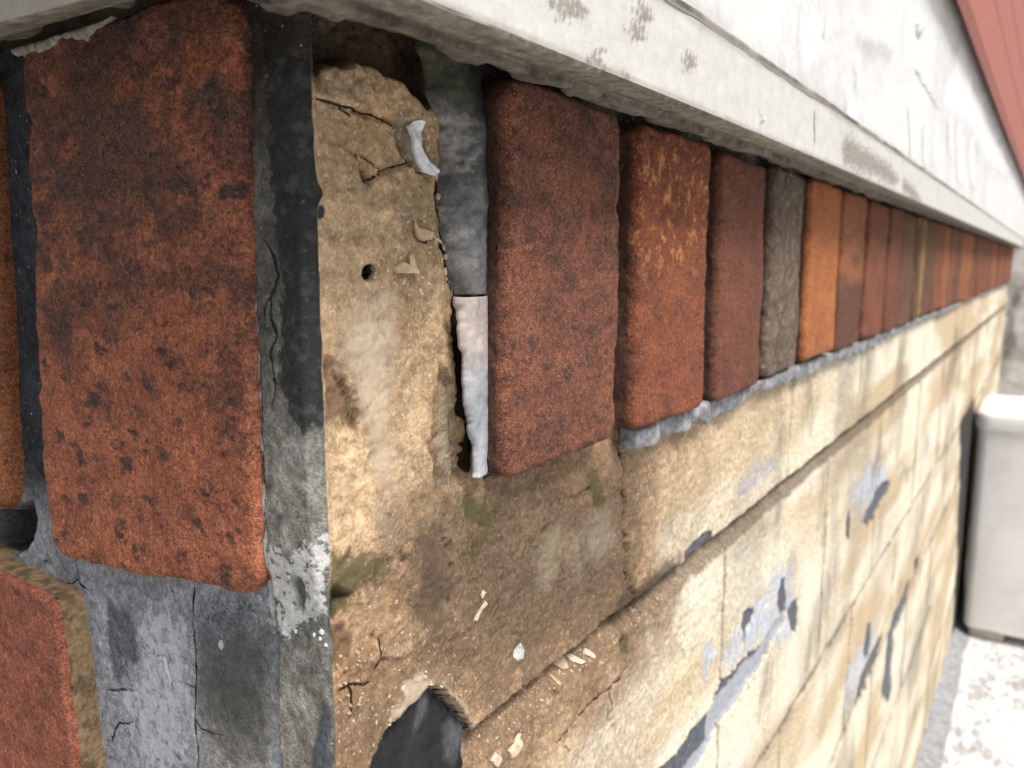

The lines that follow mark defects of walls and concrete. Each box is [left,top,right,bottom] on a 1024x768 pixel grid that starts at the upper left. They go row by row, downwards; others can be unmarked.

crack [315,98,392,126]
crack [354,153,422,182]
peeling [311,13,491,478]
crack [264,241,279,408]
peeling [258,349,361,715]
peeling [845,456,890,538]
crack [159,585,224,766]
crack [339,637,382,717]
spalling [370,670,474,768]
peeling [660,553,799,768]
peeling [844,582,909,713]